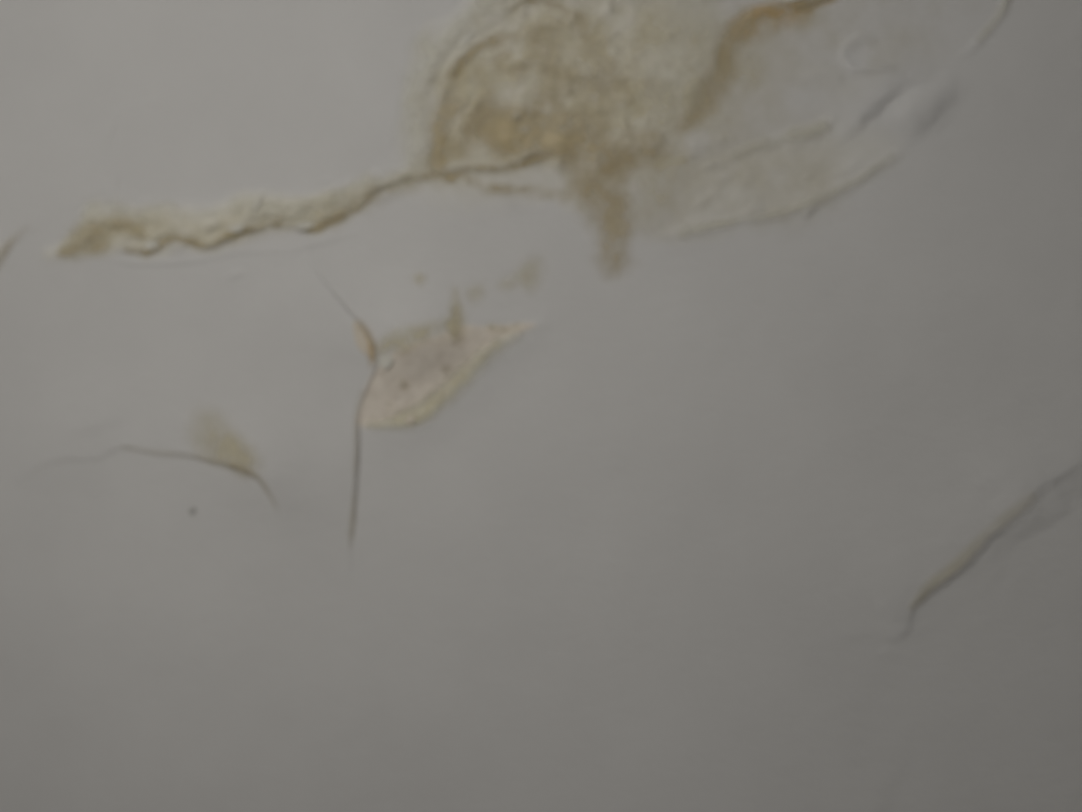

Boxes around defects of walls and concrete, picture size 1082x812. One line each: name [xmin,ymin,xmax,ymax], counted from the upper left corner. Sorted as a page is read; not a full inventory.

spalling [34,150,563,472]
water stain [306,208,347,232]